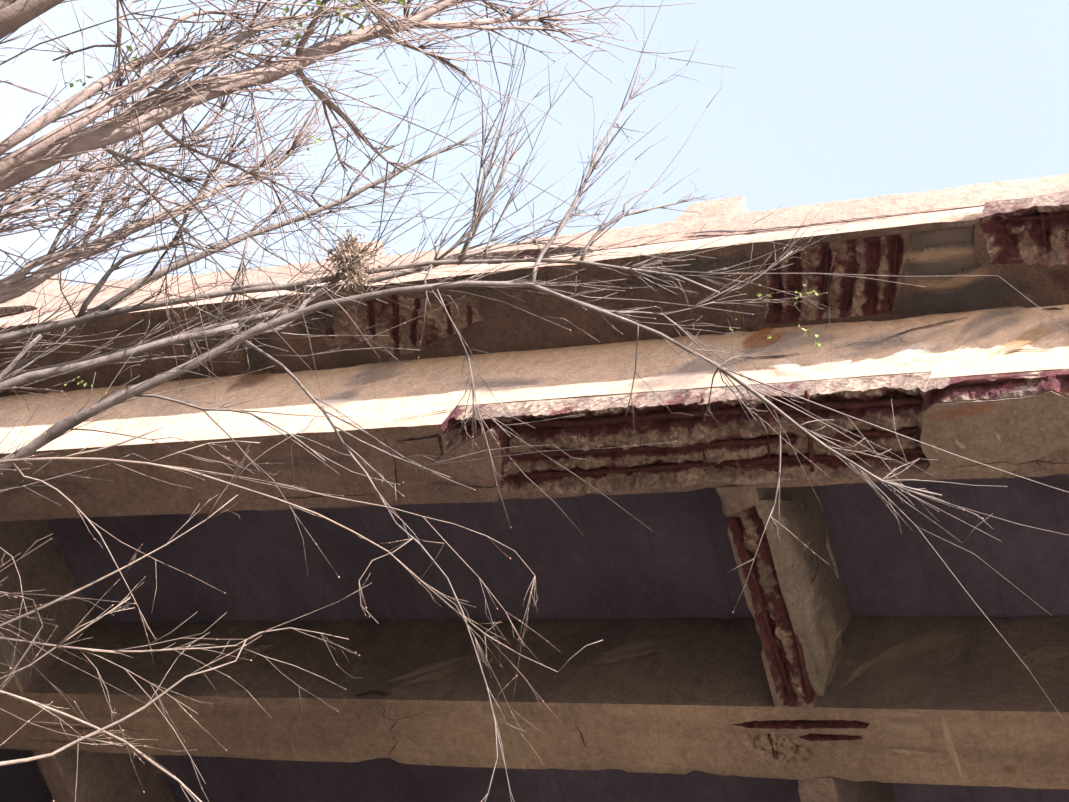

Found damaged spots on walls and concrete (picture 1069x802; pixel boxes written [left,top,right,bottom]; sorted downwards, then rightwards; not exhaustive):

spalling [312,294,484,354]
spalling [765,191,1069,324]
crack [255,406,464,499]
spalling [397,369,1069,504]
crack [942,460,1069,470]
spalling [726,506,869,741]